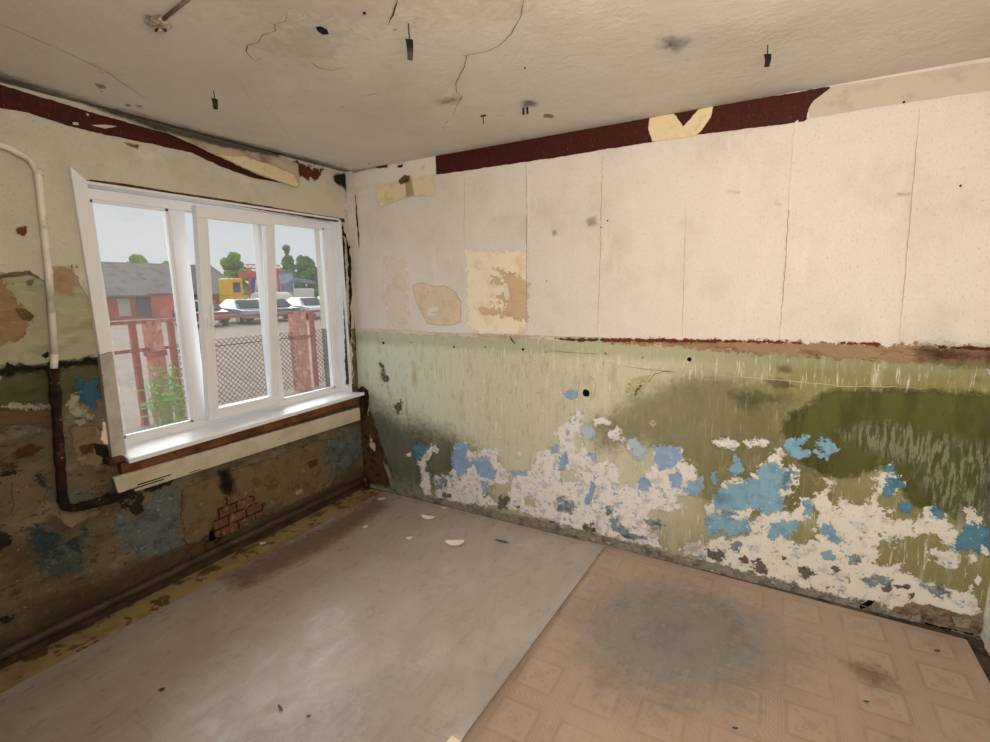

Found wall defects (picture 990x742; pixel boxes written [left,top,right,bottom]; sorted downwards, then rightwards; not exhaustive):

crack [443,0,524,128]
peeling [0,271,40,347]
peeling [52,265,79,296]
flaking render [341,196,354,386]
peeling [413,248,531,338]
peeling [564,389,579,400]
leakage [783,387,990,529]
peeling [25,508,100,581]
peeling [113,396,990,655]